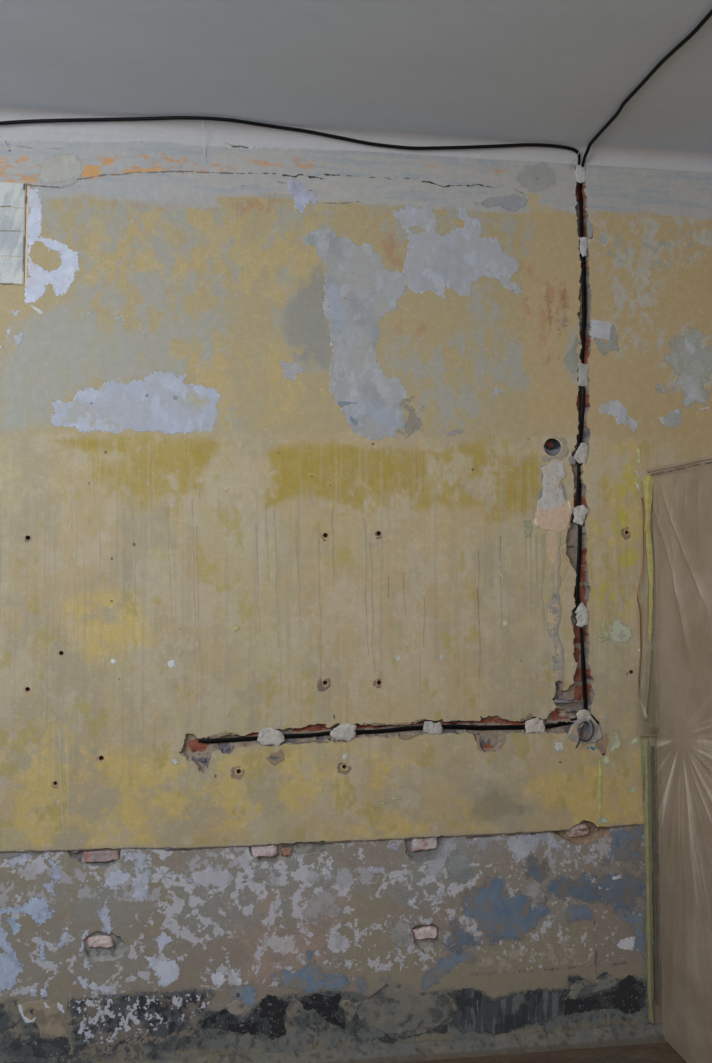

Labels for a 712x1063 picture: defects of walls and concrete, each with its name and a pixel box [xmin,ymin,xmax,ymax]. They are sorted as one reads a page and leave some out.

crack [26,144,490,204]
peeling [0,188,81,348]
peeling [301,204,522,441]
peeling [563,319,619,372]
peeling [51,371,221,435]
peeling [599,400,638,432]
spalling [248,841,326,862]
spalling [404,835,445,862]
spalling [552,820,610,870]
spalling [83,931,128,963]
spalling [412,923,440,954]
spalling [18,986,70,1039]